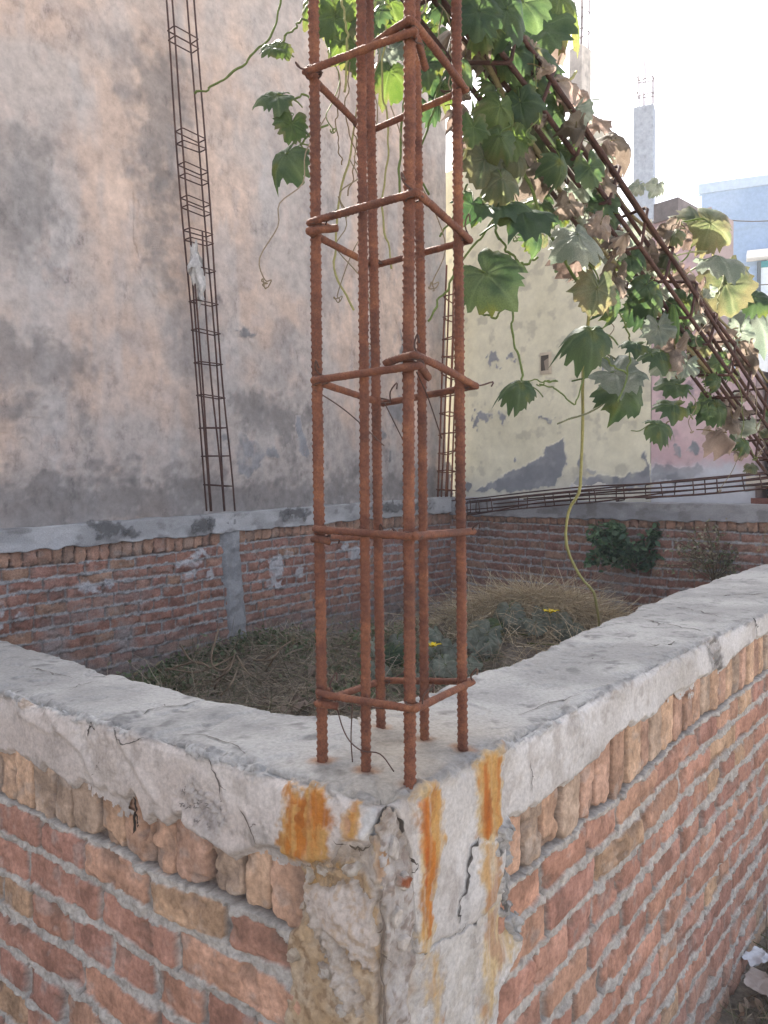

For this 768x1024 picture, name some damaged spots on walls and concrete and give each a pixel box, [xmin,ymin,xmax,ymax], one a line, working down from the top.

spalling [356,0,768,789]
crack [132,797,140,833]
crack [182,734,257,845]
spalling [284,805,419,1024]
rust [273,776,450,1024]
crack [455,838,479,935]
rust [466,739,523,1024]